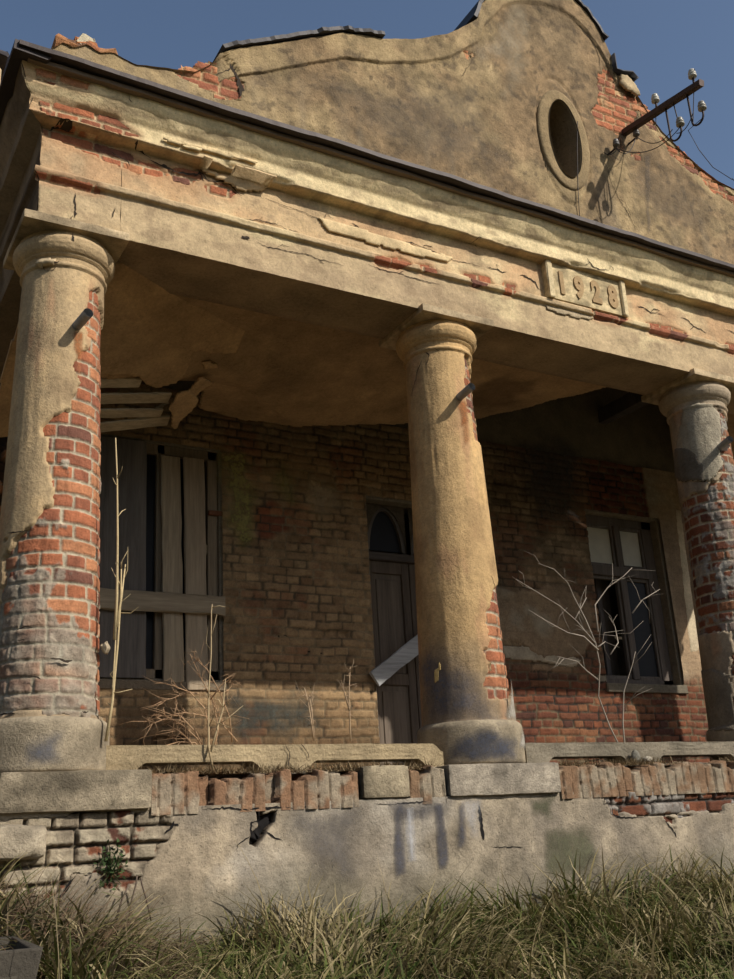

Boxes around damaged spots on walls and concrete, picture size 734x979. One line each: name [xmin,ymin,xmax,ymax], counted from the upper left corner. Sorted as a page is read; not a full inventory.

flaking render [163,137,277,192]
crack [110,140,344,266]
flaking render [169,376,213,429]
peeling [674,448,704,482]
flaking render [676,510,699,652]
flaking render [503,645,581,667]
crack [203,806,306,847]
damp [395,805,413,874]
damp [436,805,448,866]